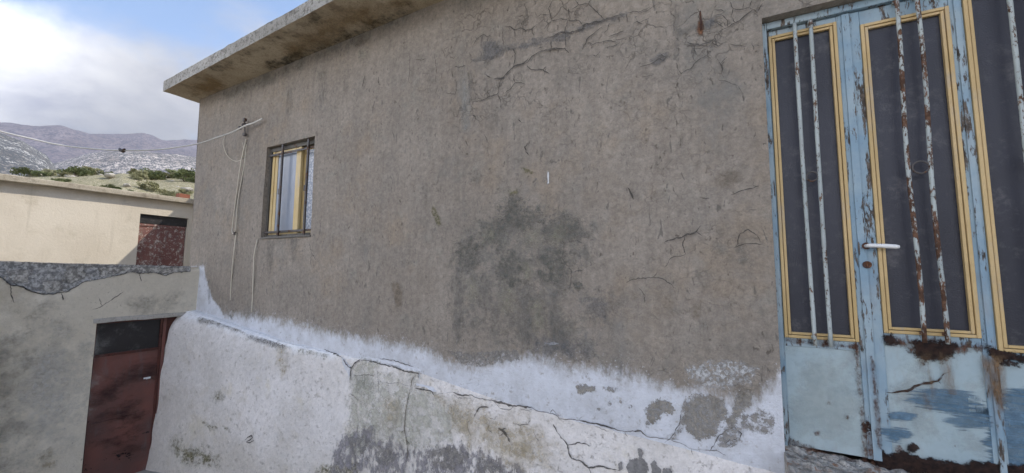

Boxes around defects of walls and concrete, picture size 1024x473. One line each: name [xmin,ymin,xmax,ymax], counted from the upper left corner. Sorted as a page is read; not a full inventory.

crack [408,0,654,155]
crack [640,1,763,92]
crack [628,228,702,302]
crack [351,368,415,460]
crack [437,392,742,473]
peeling [646,390,775,448]